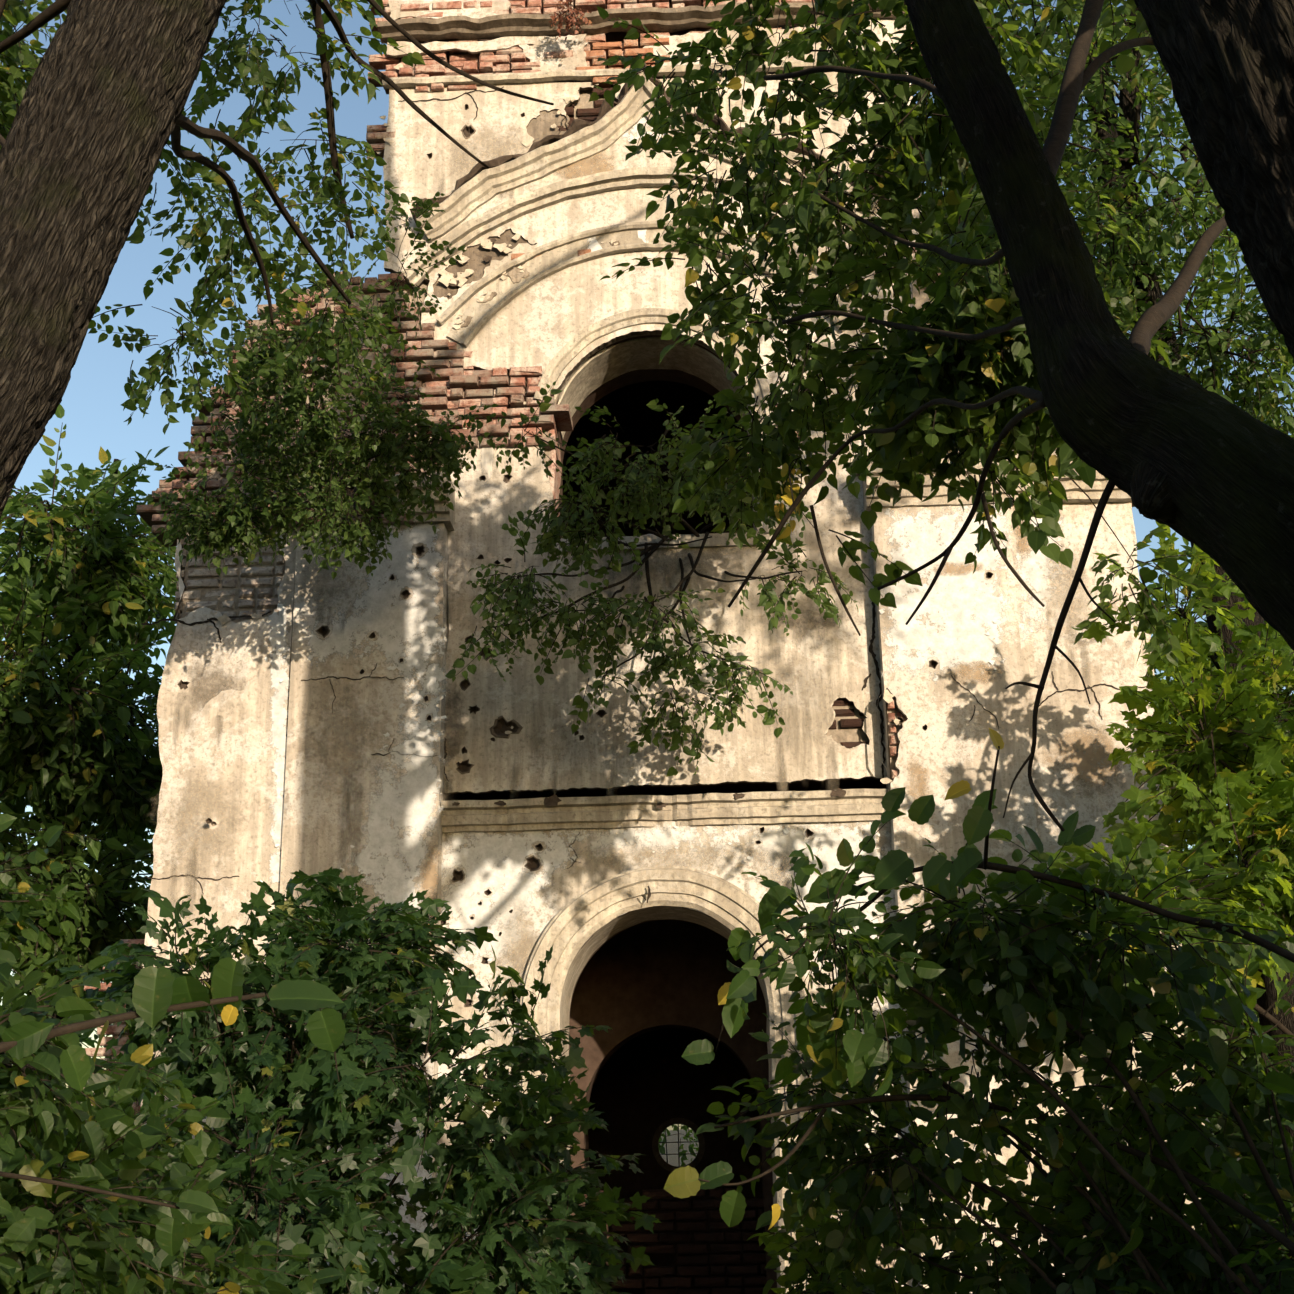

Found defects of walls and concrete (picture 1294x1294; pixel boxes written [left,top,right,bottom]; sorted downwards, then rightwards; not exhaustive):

flaking render [382,38,670,147]
flaking render [426,230,548,303]
flaking render [358,314,542,447]
crack [301,663,404,714]
peeling [174,523,891,968]
crack [862,602,886,778]
peeling [878,503,1069,784]